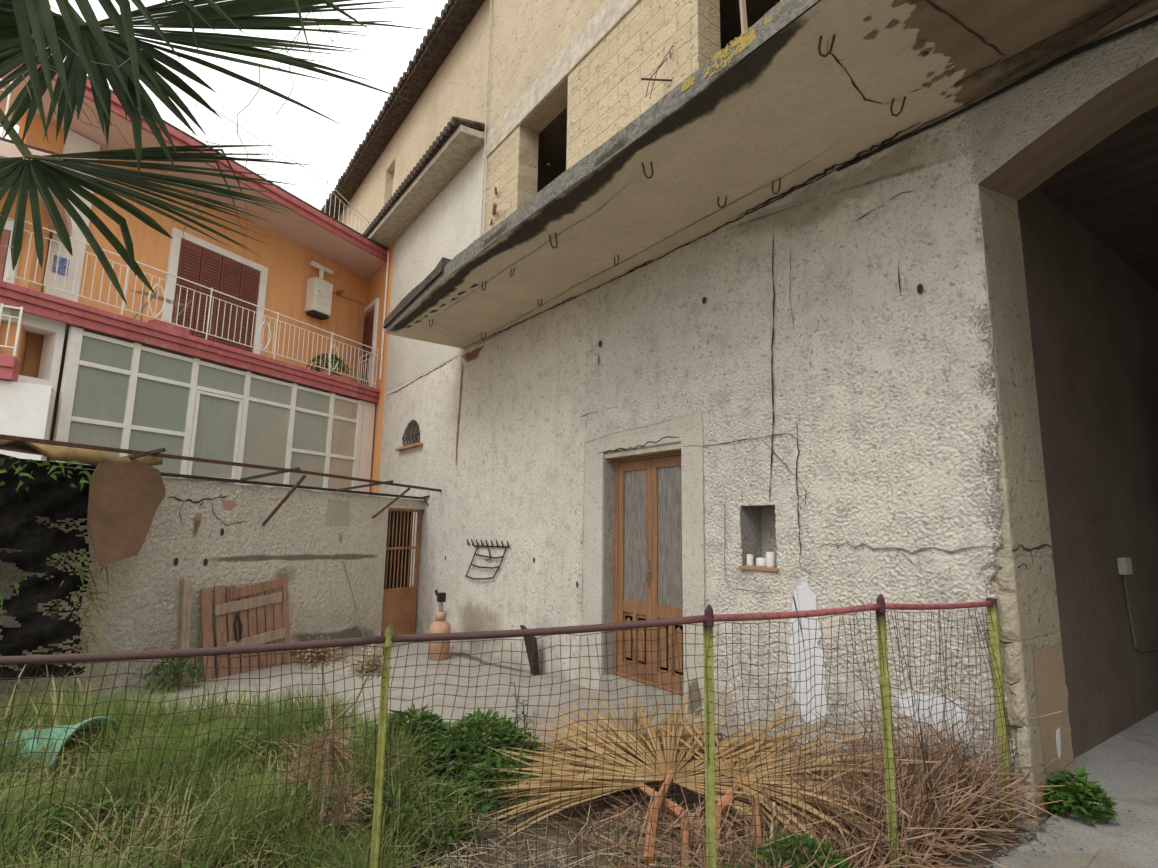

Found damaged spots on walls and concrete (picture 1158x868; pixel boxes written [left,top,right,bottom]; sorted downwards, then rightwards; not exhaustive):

damp [391,22,803,332]
crack [388,0,1052,580]
crack [703,504,768,615]